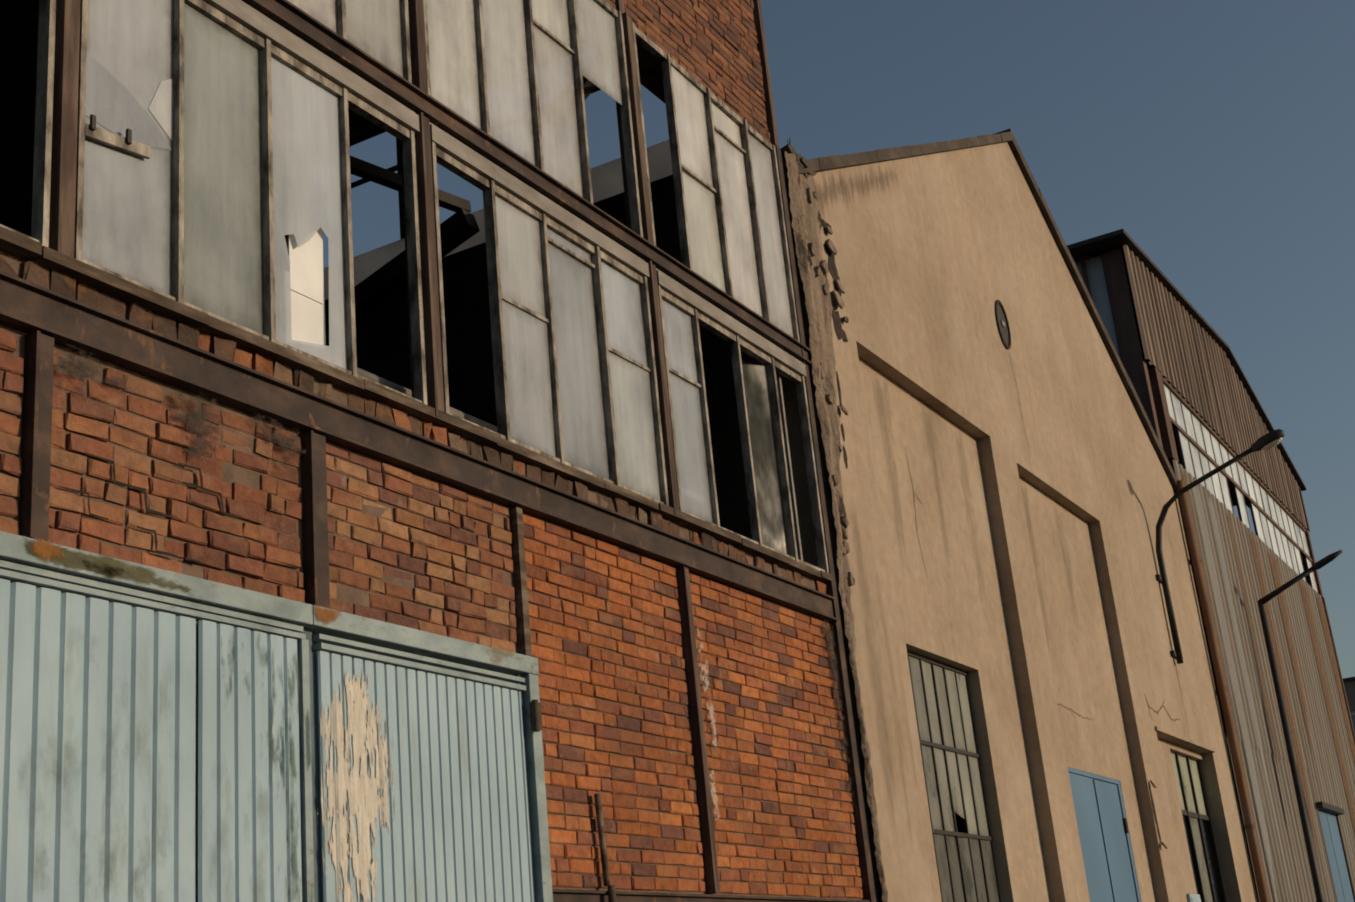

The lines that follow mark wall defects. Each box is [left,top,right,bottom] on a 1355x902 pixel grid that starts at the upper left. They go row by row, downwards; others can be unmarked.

spalling [785,151,888,902]
rust [33,539,64,561]
rust [315,605,341,623]
crack [1145,694,1180,721]
peeling [306,669,396,902]